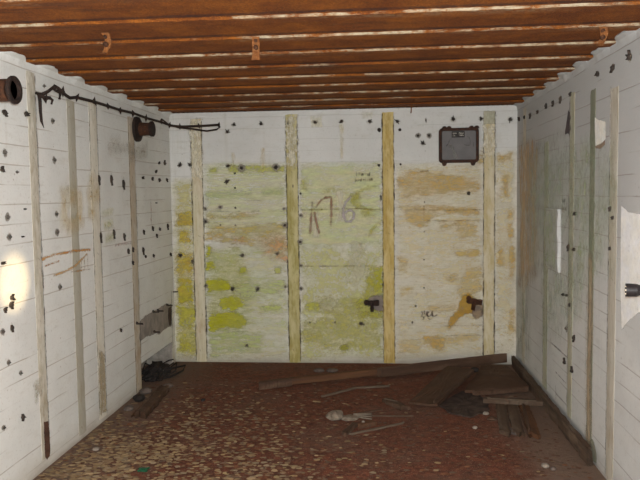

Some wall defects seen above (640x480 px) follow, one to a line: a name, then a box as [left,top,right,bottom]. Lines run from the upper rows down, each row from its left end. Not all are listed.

spalling [595,118,606,146]
peeling [620,205,640,329]
rust [449,293,473,328]